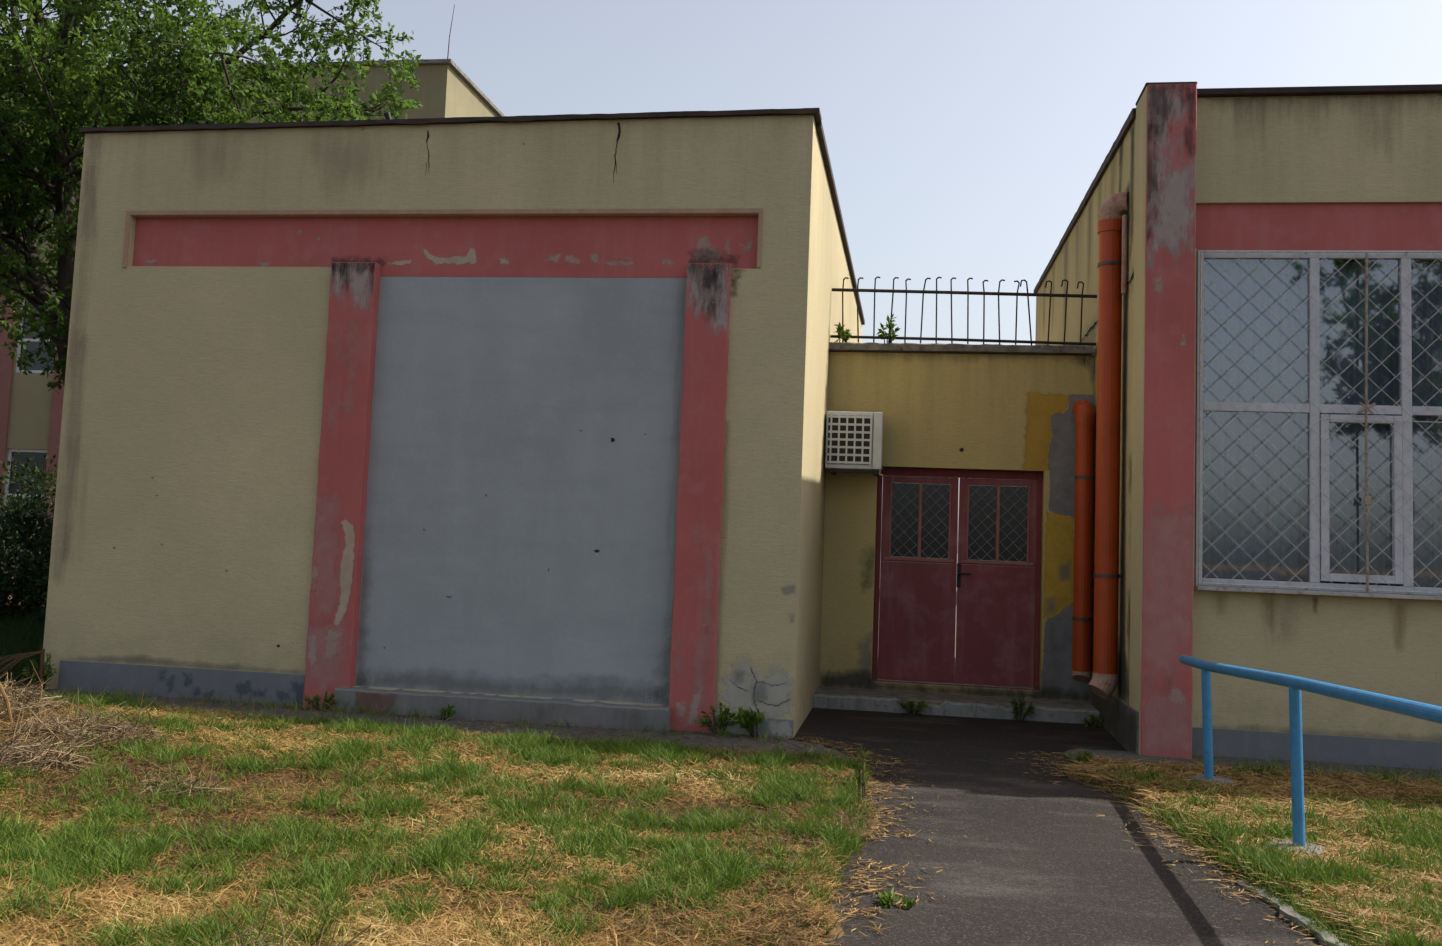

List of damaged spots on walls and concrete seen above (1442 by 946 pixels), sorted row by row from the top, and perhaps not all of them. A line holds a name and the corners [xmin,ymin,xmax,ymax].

crack [423,130,431,174]
crack [613,123,621,181]
peeling [389,247,477,265]
peeling [334,519,355,626]